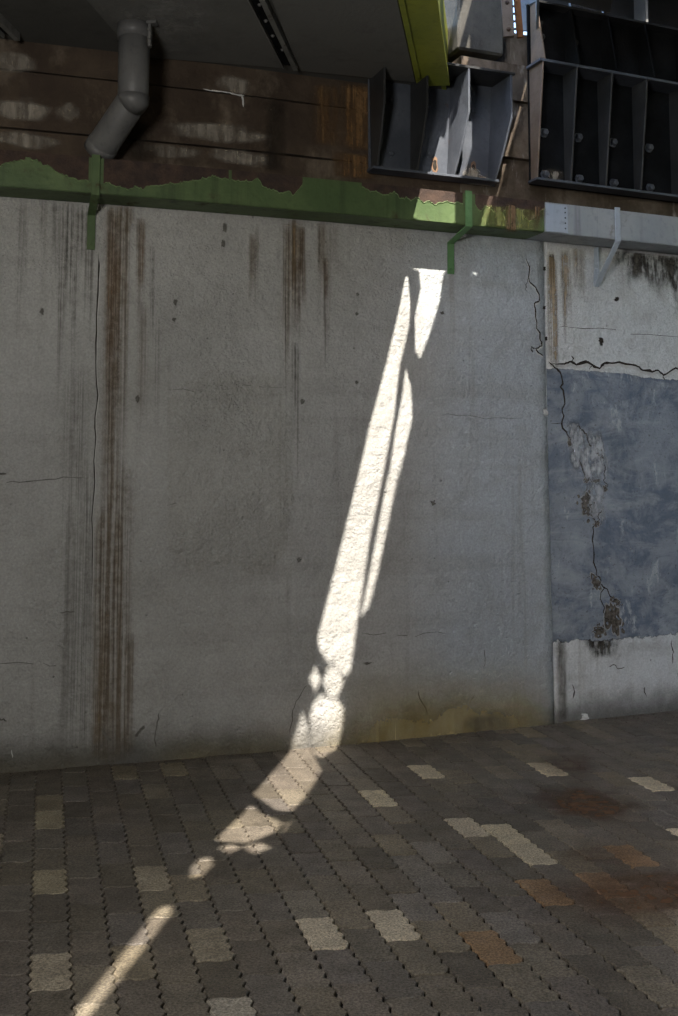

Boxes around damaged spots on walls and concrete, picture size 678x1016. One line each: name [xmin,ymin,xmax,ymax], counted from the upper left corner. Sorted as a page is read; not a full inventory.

peeling [0,150,89,182]
peeling [103,158,303,196]
rust [548,251,577,359]
crack [525,259,678,620]
spalling [576,476,608,528]
spalling [589,572,625,639]